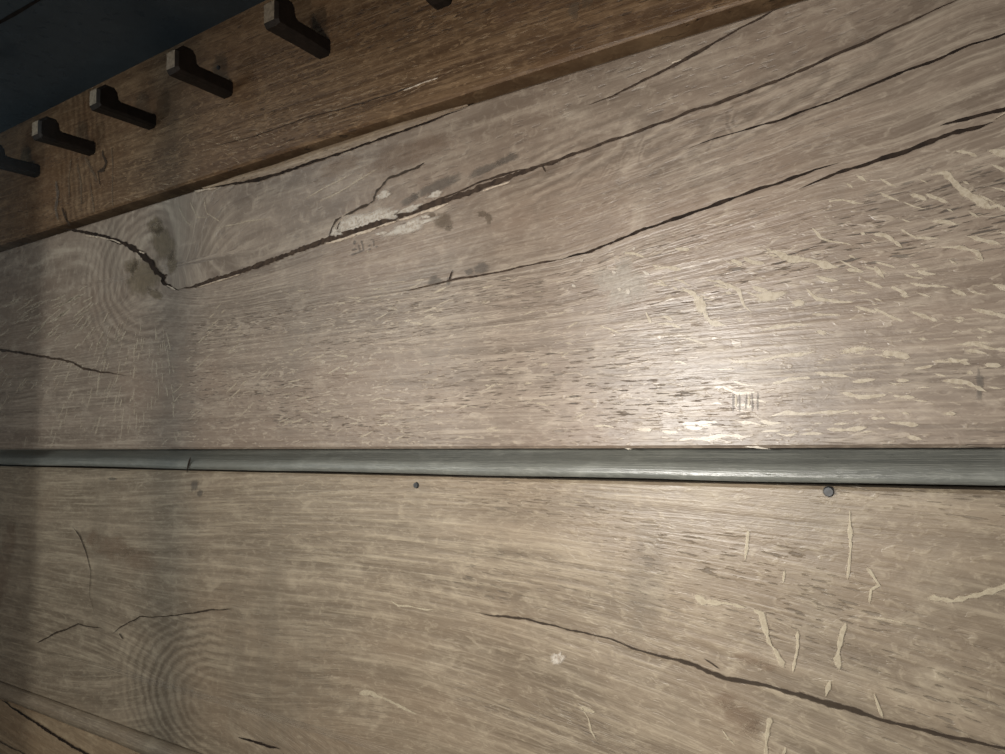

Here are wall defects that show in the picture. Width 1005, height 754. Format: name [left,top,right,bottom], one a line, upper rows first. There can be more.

crack [61,0,1005,291]
crack [0,349,122,375]
crack [2,700,88,754]
crack [481,613,1005,749]